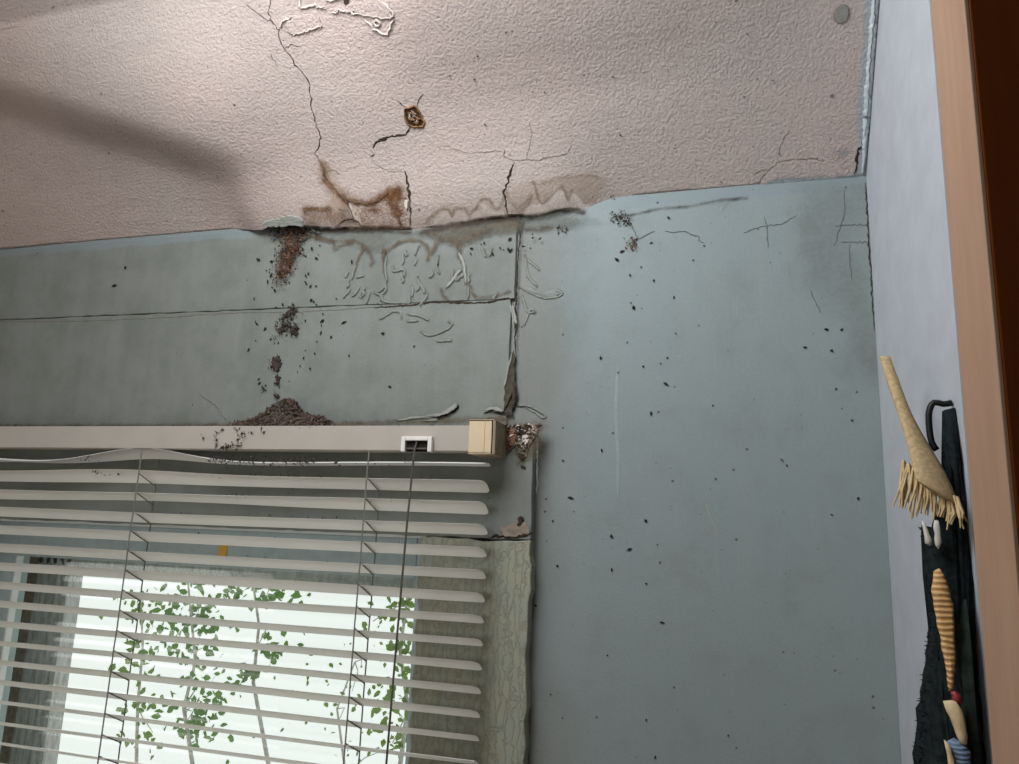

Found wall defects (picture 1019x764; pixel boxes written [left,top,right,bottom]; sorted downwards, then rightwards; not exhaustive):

crack [247,0,352,216]
crack [0,121,572,416]
water stain [306,185,591,275]